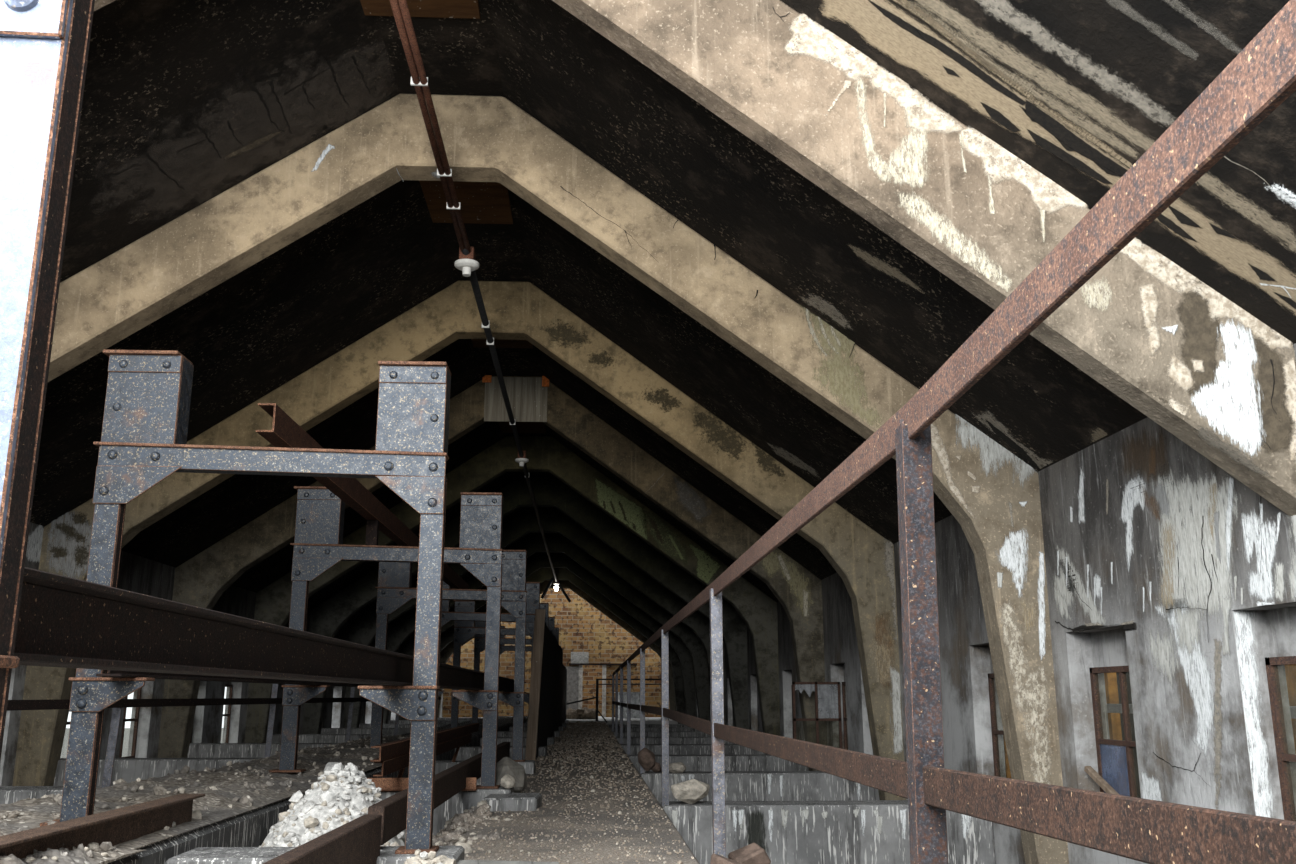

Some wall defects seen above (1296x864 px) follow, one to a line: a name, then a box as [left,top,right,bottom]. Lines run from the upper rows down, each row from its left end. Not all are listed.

damp [1108,0,1198,59]
damp [1165,0,1242,54]
damp [821,0,1174,188]
damp [900,193,1012,292]
damp [1155,173,1296,315]
crack [1260,283,1296,298]
damp [540,319,617,367]
damp [642,387,681,413]
damp [695,410,821,481]
peeling [955,414,1034,493]
crack [1166,516,1218,643]
peeling [997,502,1052,784]